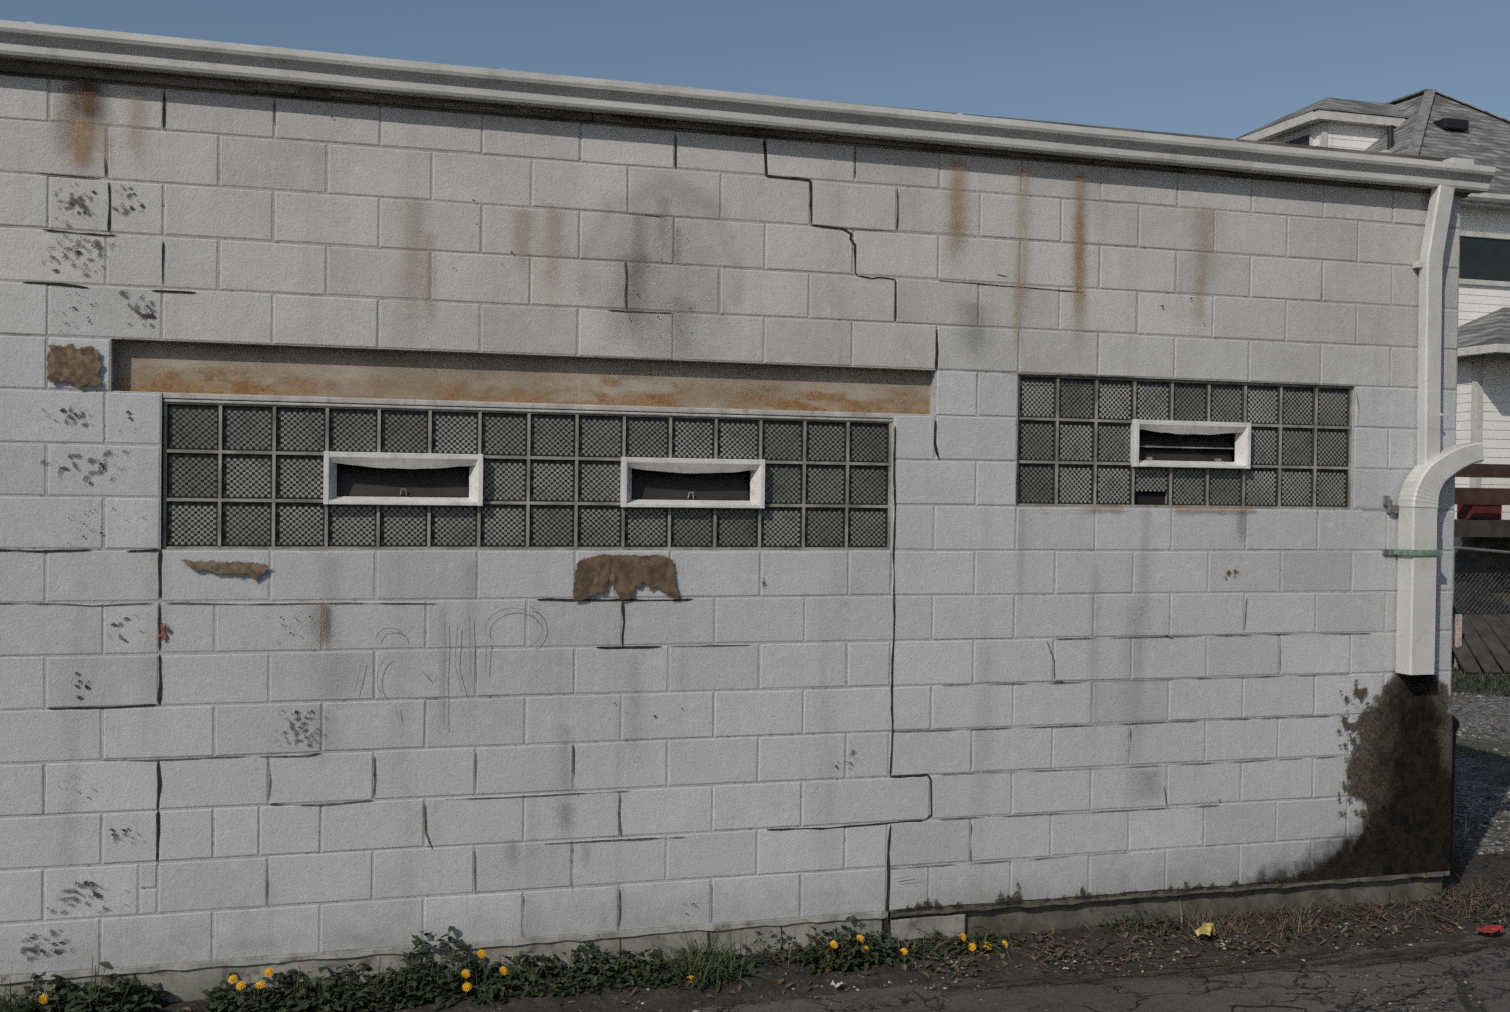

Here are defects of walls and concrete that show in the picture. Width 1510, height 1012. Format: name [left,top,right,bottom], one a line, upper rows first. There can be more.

crack [763,138,898,321]
spalling [42,183,114,387]
peeling [118,290,155,327]
crack [932,328,940,370]
rust [120,373,314,394]
rust [445,379,678,407]
rust [754,392,929,414]
peeling [180,559,270,579]
peeling [573,554,679,601]
crack [767,420,1372,943]
water stain [1256,669,1453,885]
crack [424,805,433,850]